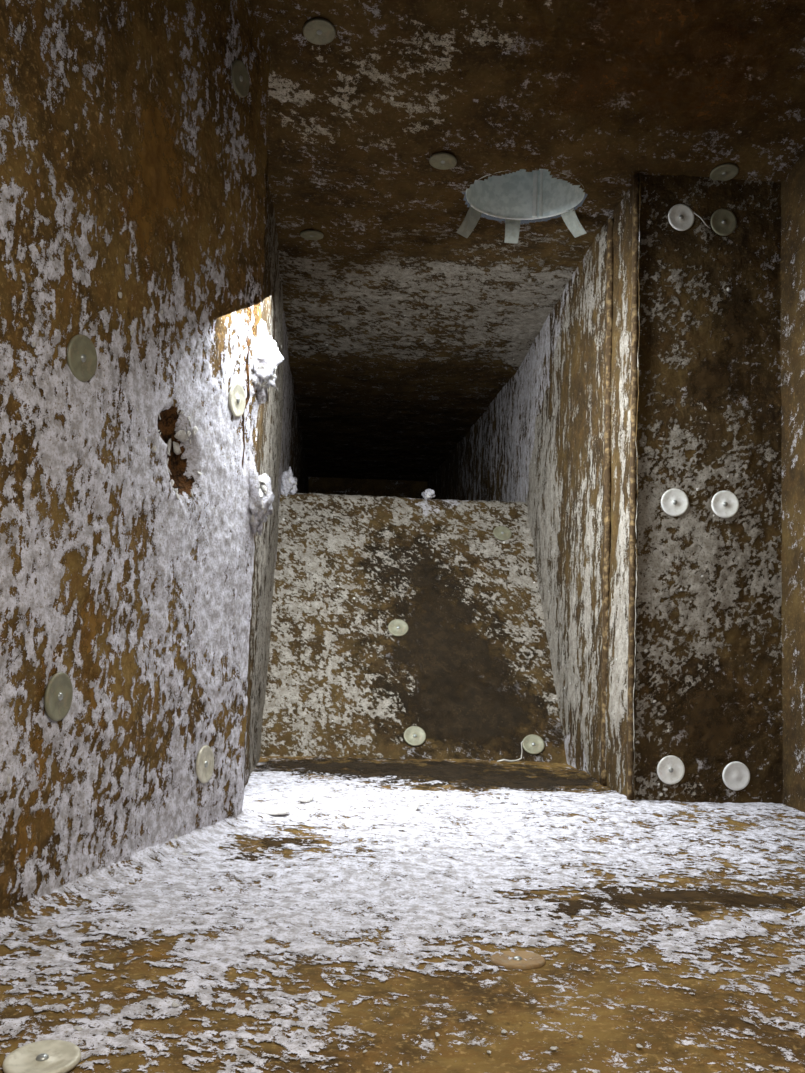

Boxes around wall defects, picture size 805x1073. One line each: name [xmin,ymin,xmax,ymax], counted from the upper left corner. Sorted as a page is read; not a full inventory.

water stain [0,0,198,276]
peeling [145,430,180,500]
water stain [38,646,62,715]
water stain [80,593,106,741]
water stain [12,731,47,866]
water stain [234,838,322,861]
water stain [510,884,805,922]
water stain [120,949,177,959]